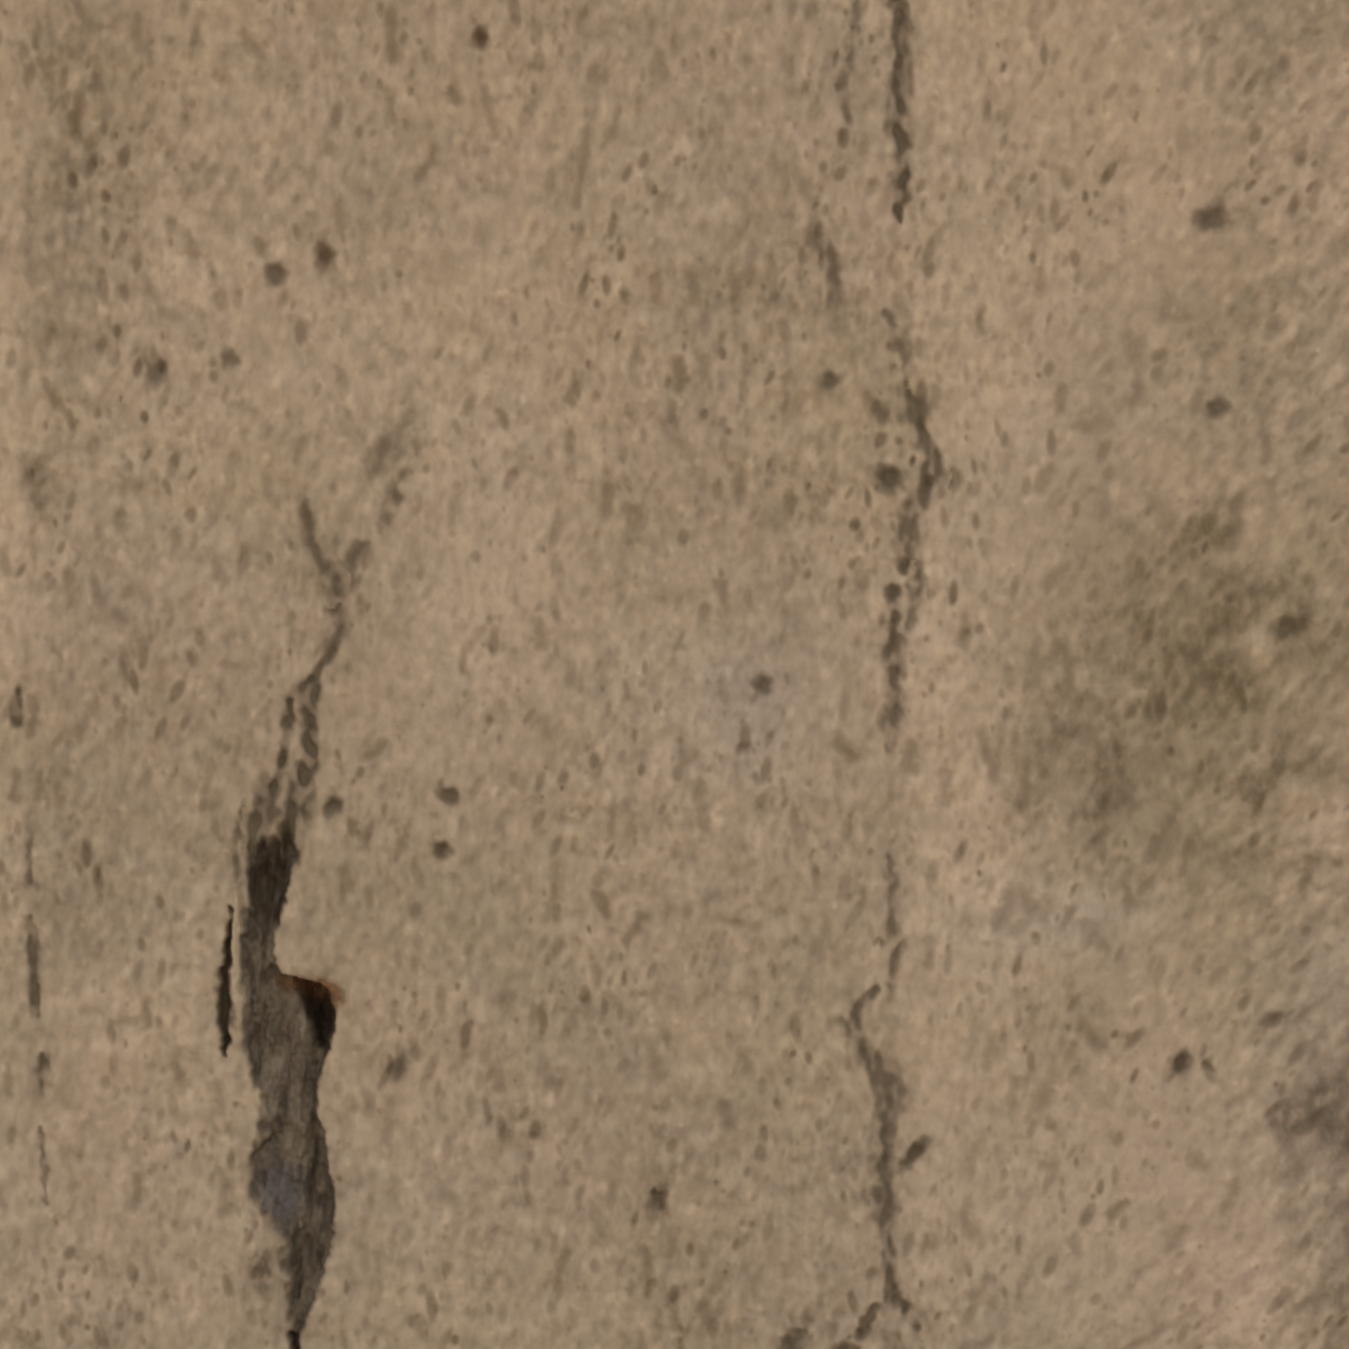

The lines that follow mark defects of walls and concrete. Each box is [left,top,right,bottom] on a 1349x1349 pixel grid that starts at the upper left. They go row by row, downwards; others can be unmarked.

crack [890,0,910,223]
crack [899,390,940,573]
crack [247,602,343,863]
crack [885,611,899,724]
crack [218,939,232,1056]
crack [847,986,920,1330]
crack [291,1331,300,1349]